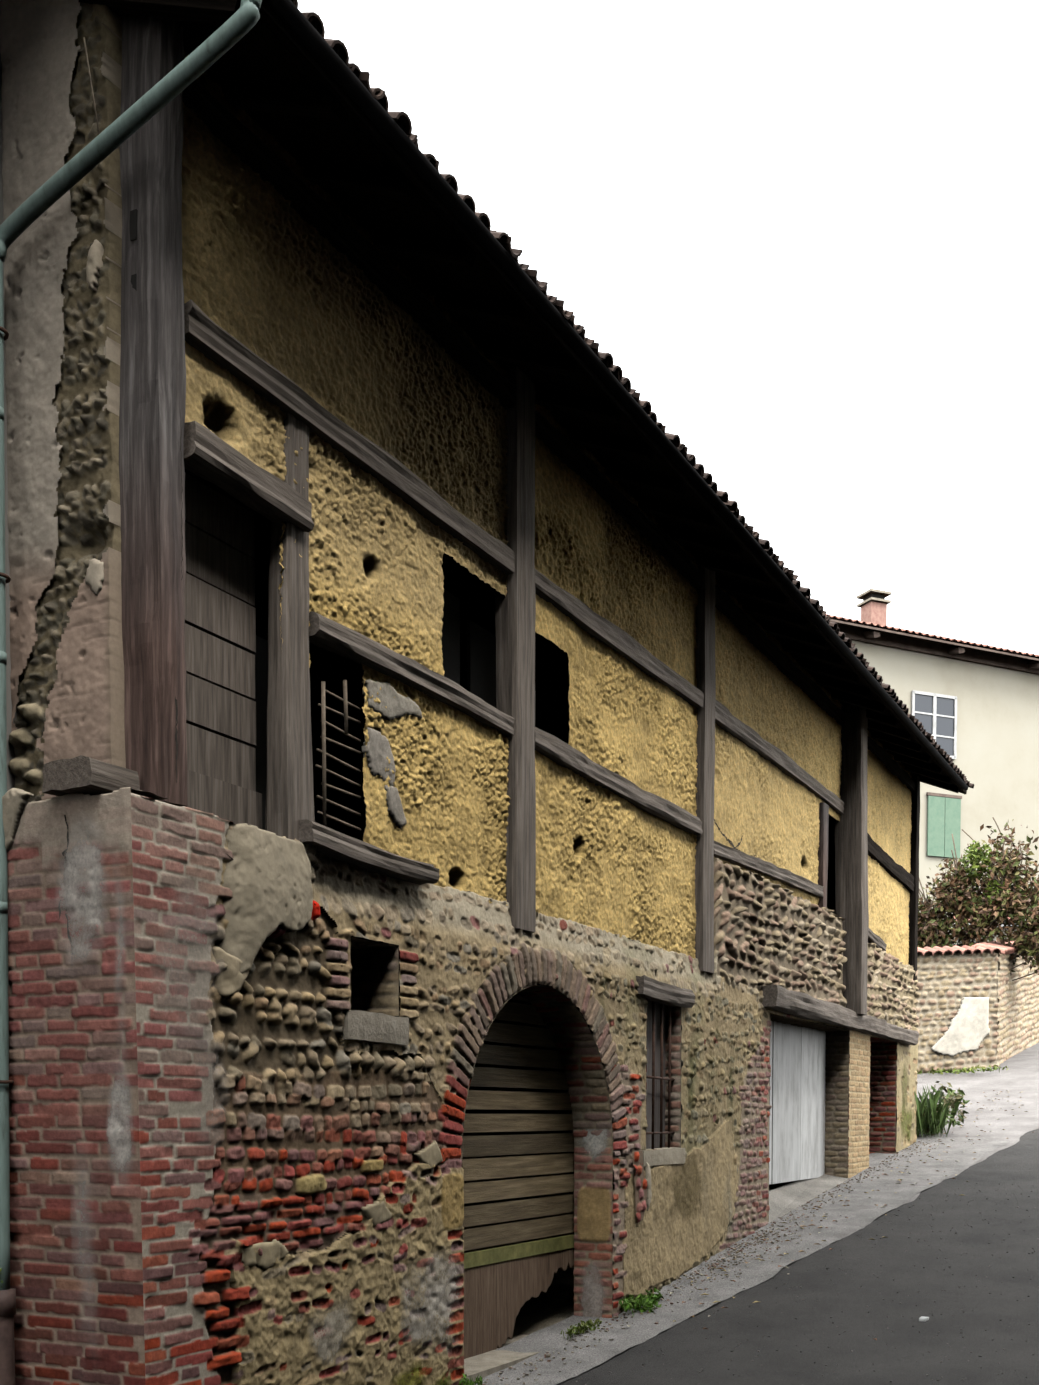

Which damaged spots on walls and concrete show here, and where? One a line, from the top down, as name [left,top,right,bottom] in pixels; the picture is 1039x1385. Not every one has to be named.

spalling [64,2,122,164]
spalling [2,146,122,852]
spalling [225,904,448,1271]